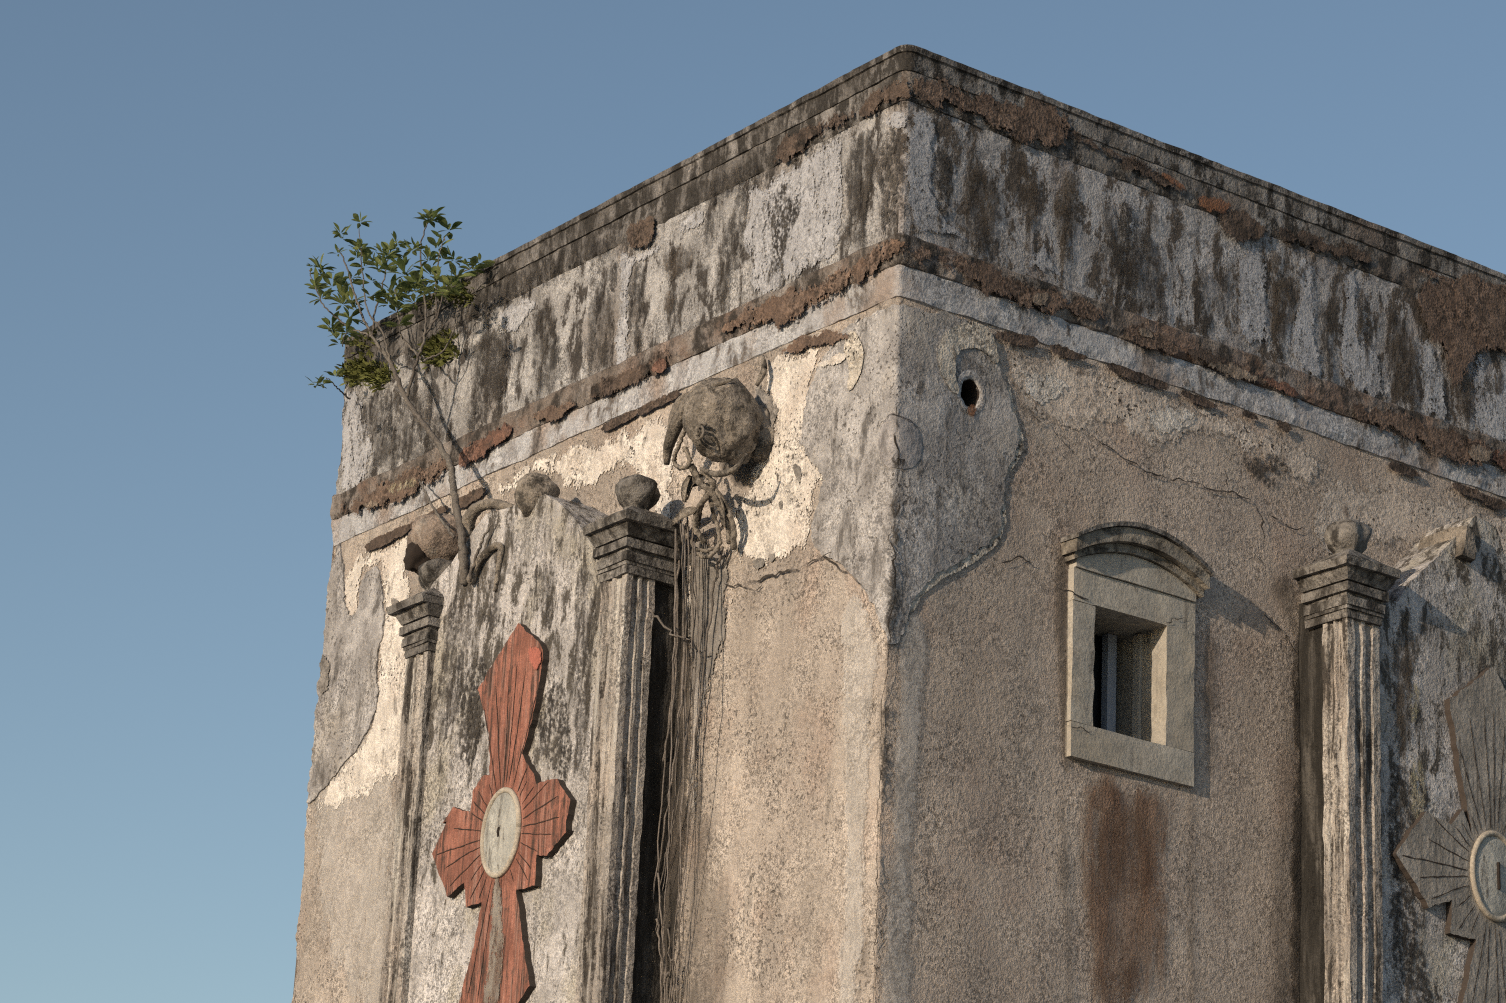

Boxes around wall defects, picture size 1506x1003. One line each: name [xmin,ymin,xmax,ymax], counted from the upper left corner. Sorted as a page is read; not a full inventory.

water stain [358,224,651,469]
water stain [662,163,756,314]
water stain [771,184,800,289]
water stain [845,127,906,251]
flaking render [719,77,1187,570]
spalling [1219,209,1506,471]
flaking render [885,322,1506,649]
water stain [439,595,486,766]
flaking render [315,390,680,1003]
water stain [537,571,597,778]
spalling [878,688,890,836]
water stain [1386,609,1434,1003]